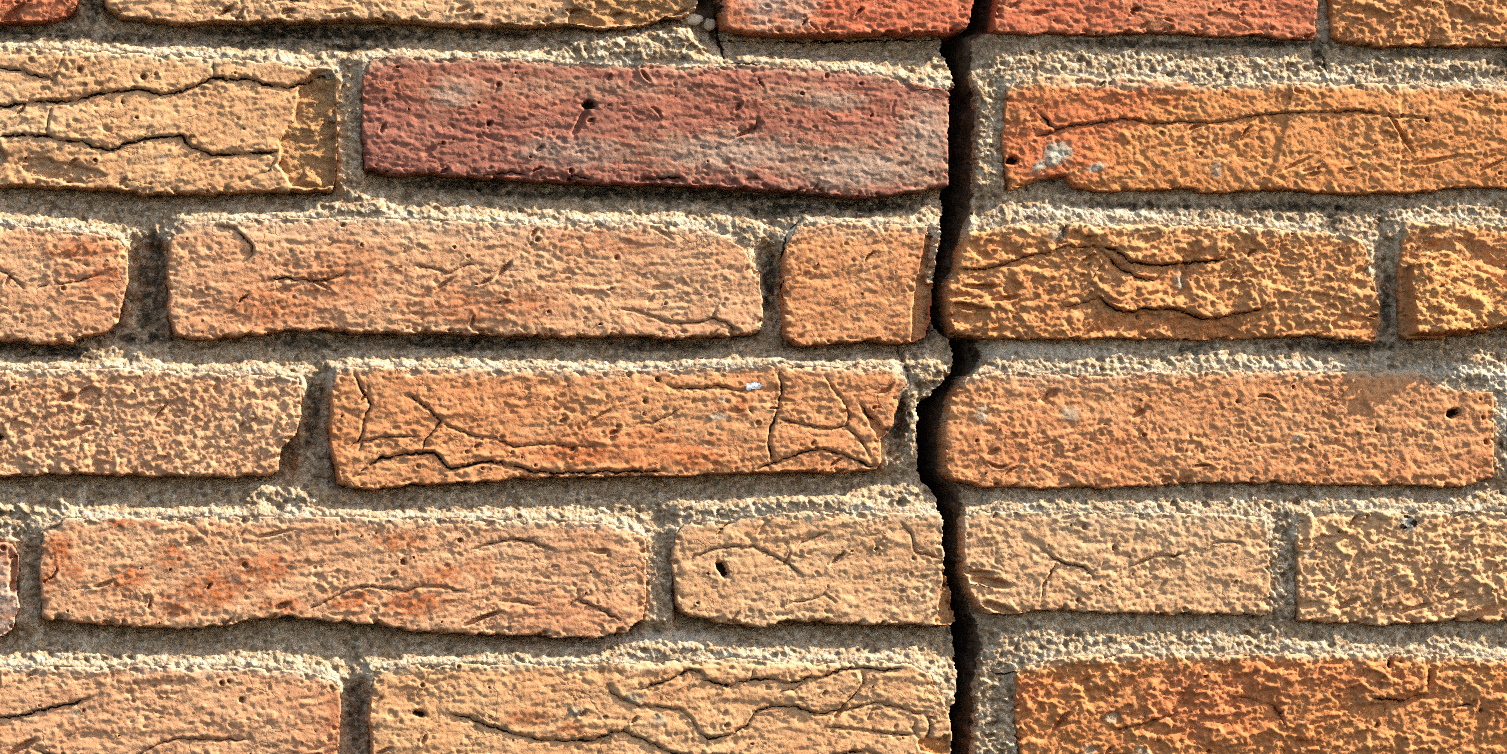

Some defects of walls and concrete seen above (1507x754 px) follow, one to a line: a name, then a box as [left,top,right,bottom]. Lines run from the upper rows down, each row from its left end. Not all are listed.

crack [455,0,1262,754]